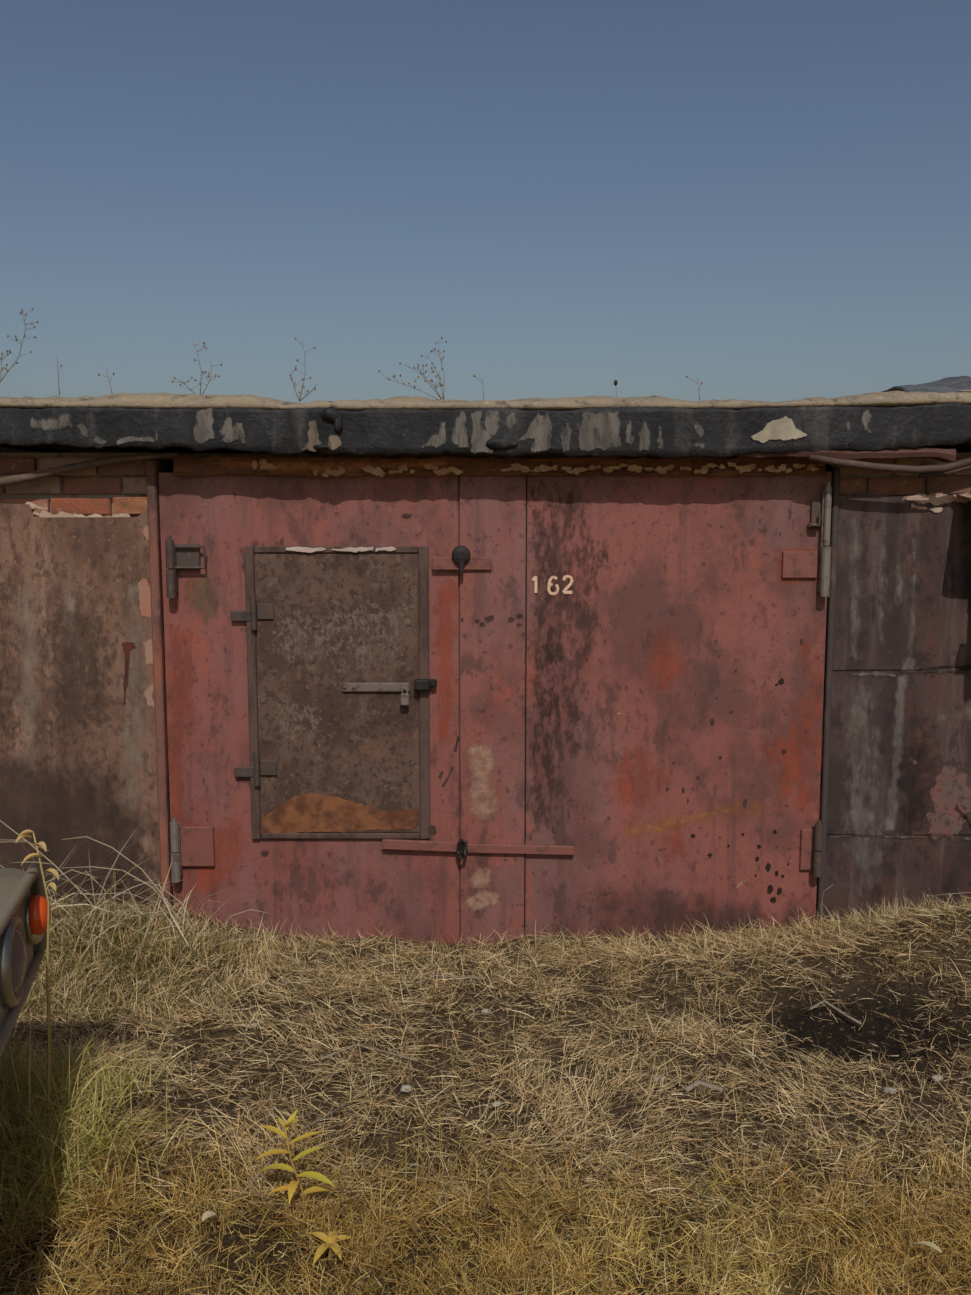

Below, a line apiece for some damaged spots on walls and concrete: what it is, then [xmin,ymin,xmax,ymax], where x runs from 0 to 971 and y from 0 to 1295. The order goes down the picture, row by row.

peeling [77,424,158,444]
peeling [193,407,245,444]
peeling [301,420,341,452]
peeling [422,411,493,453]
peeling [694,424,705,449]
spalling [751,416,807,443]
peeling [846,410,872,433]
water stain [845,566,929,890]
water stain [0,588,145,908]